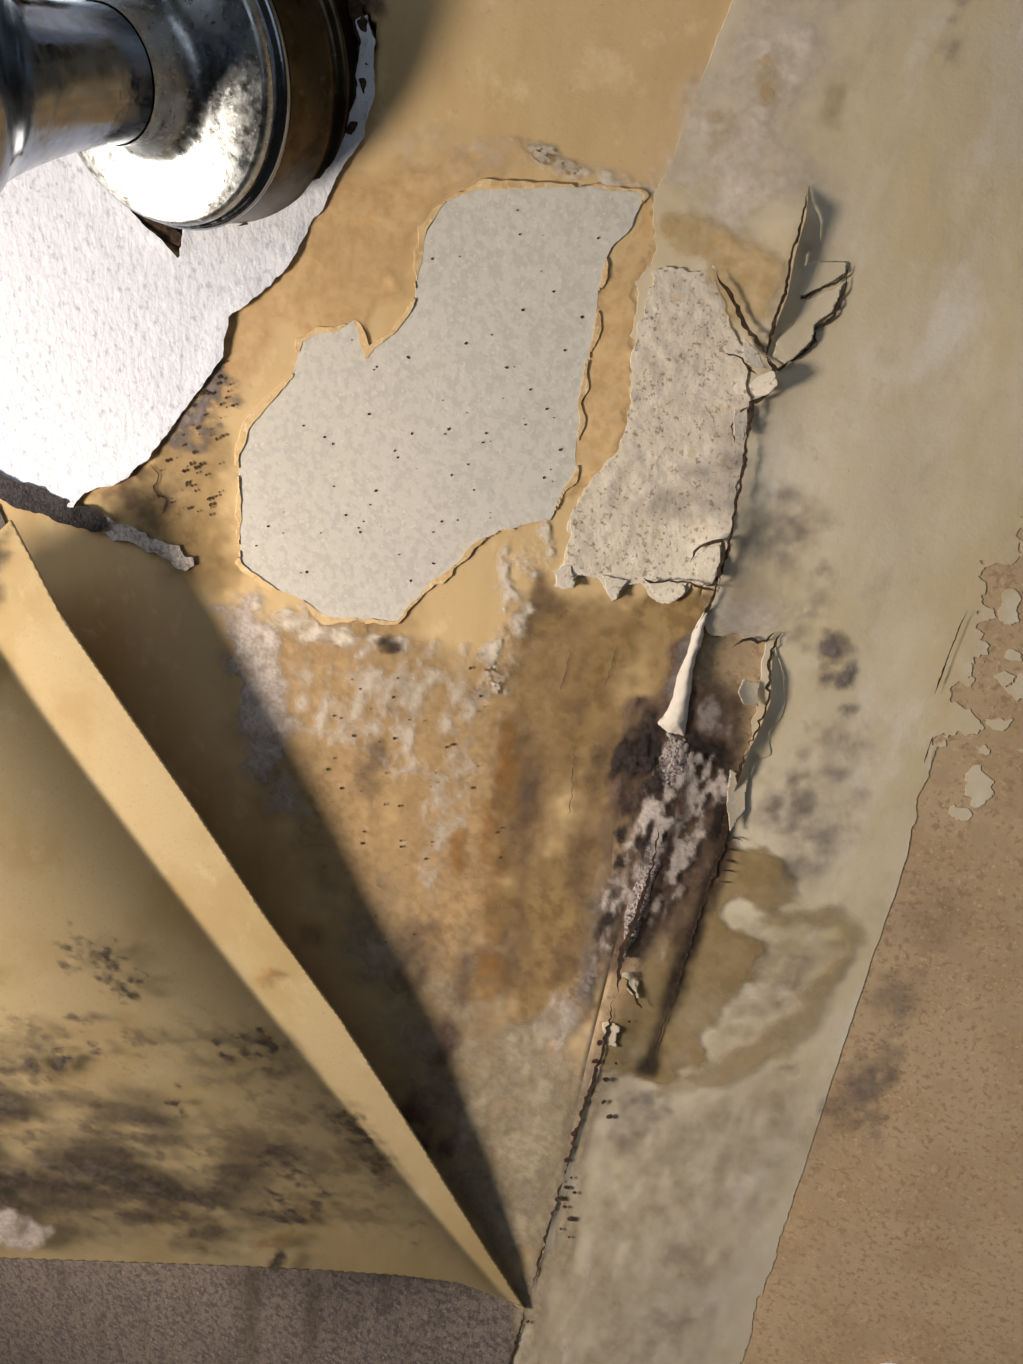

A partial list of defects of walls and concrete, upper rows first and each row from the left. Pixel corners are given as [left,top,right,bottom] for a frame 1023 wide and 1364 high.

spalling [131,210,183,247]
peeling [214,0,819,808]
leakage [537,519,554,558]
crack [644,187,850,639]
leakage [60,938,143,1000]
leakage [0,1025,332,1272]
leakage [268,547,852,1359]
crack [509,632,785,1364]